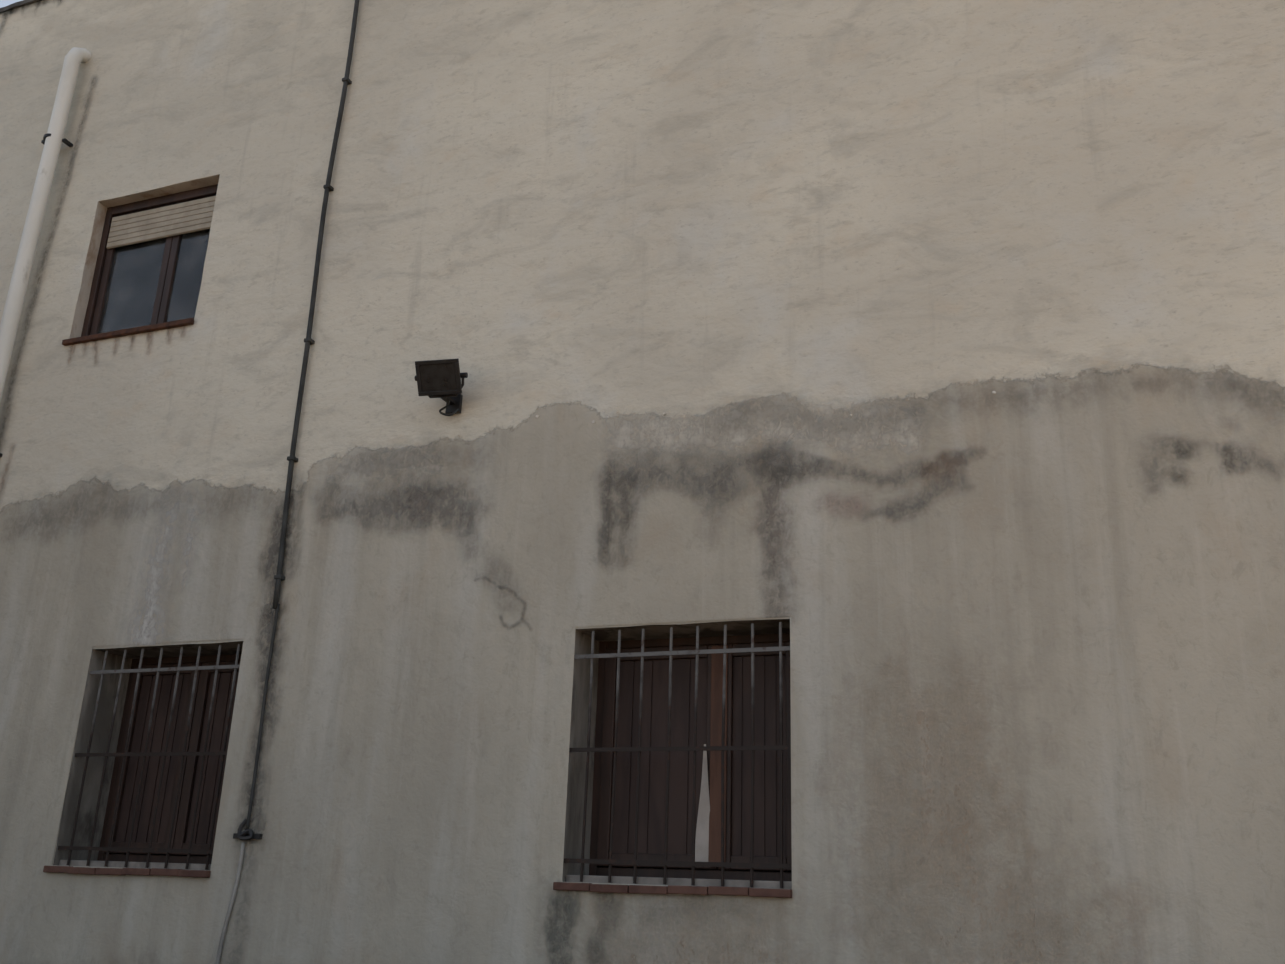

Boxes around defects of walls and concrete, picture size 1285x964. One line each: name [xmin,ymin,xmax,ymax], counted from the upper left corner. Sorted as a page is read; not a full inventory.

leakage [133,503,193,646]
leakage [322,484,475,525]
leakage [600,450,973,576]
peeling [0,364,1285,964]